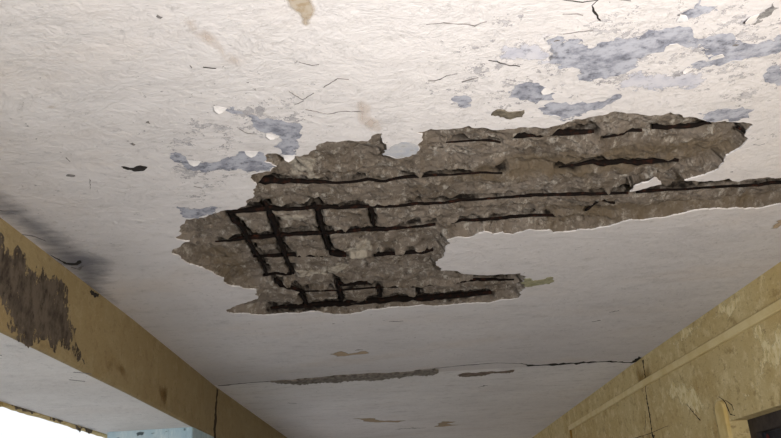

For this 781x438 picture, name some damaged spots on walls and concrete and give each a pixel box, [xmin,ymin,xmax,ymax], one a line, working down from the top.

water stain [289,0,313,24]
spalling [169,0,781,315]
water stain [51,253,93,279]
crack [213,381,270,438]
crack [512,357,667,438]